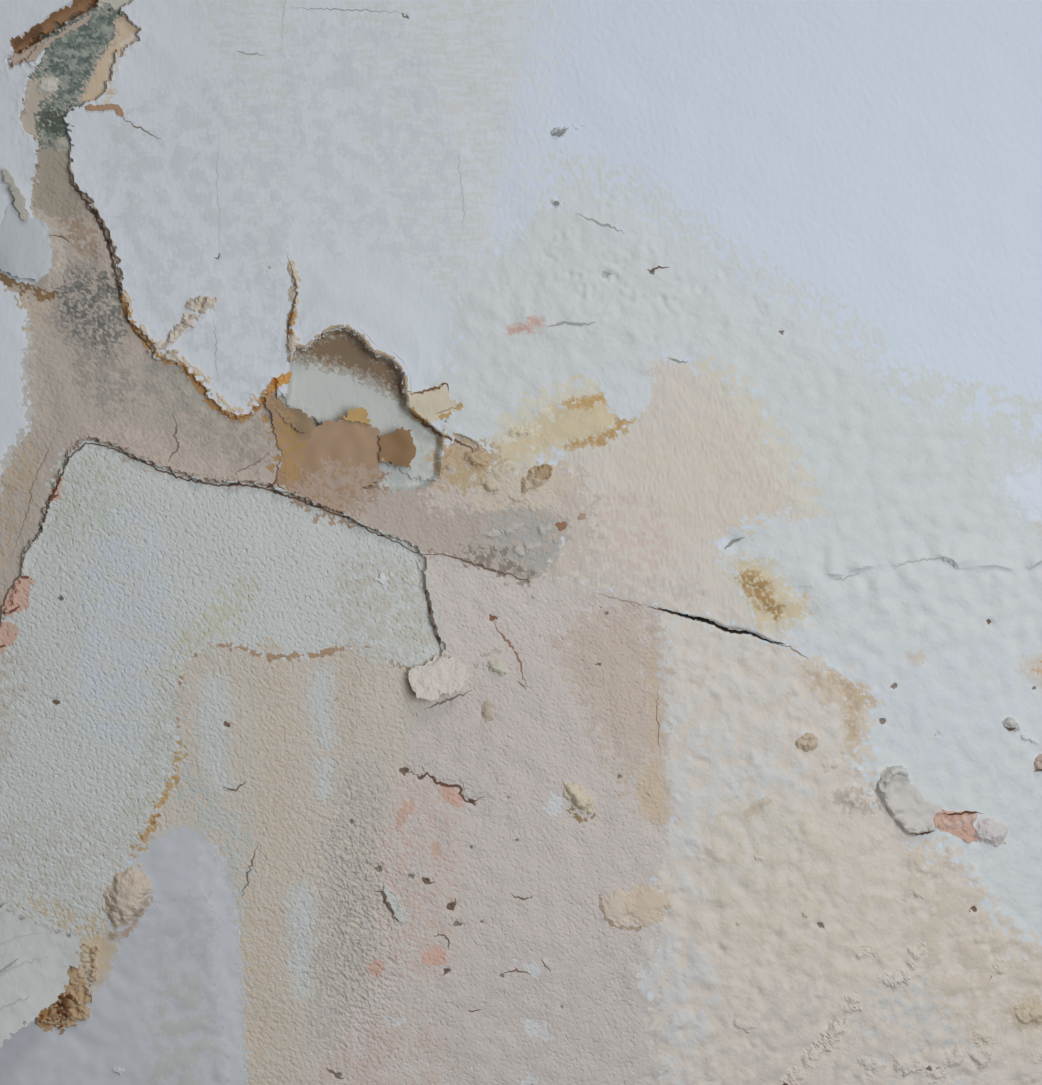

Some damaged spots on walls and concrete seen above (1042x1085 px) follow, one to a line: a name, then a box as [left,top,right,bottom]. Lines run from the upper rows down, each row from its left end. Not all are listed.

leakage [27,0,140,152]
crack [0,413,534,653]
spalling [0,0,681,1085]
crack [725,537,745,549]
crack [894,557,957,570]
crack [492,620,527,689]
crack [597,593,806,657]